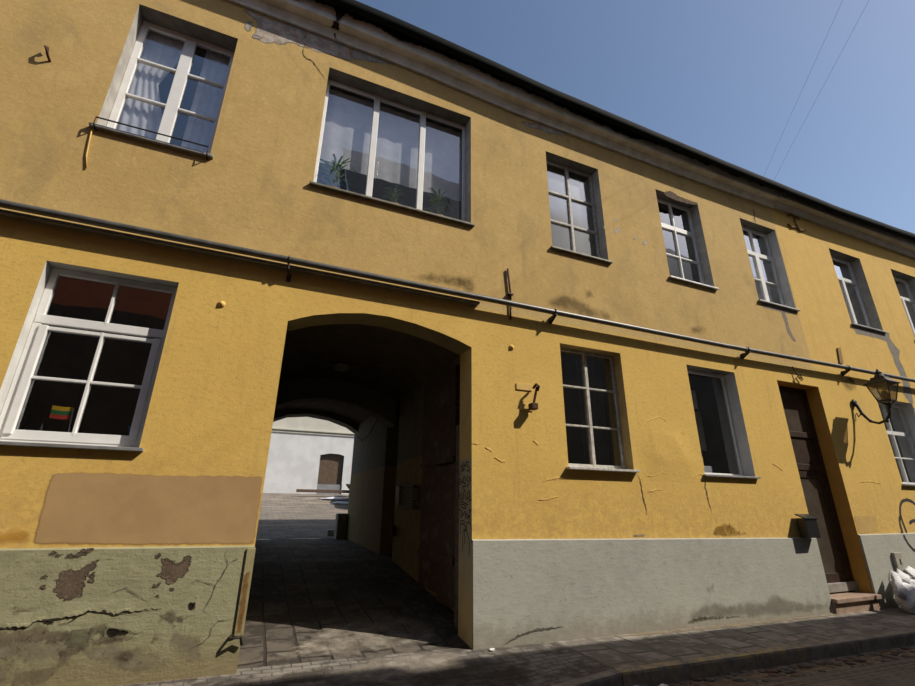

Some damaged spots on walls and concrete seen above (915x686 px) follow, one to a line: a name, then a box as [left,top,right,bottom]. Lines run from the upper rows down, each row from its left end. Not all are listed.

peeling [243,9,395,65]
spalling [315,0,711,165]
spalling [38,548,99,601]
crack [0,587,162,634]
spalling [107,628,129,637]
spalling [152,553,192,597]
crack [190,553,239,647]